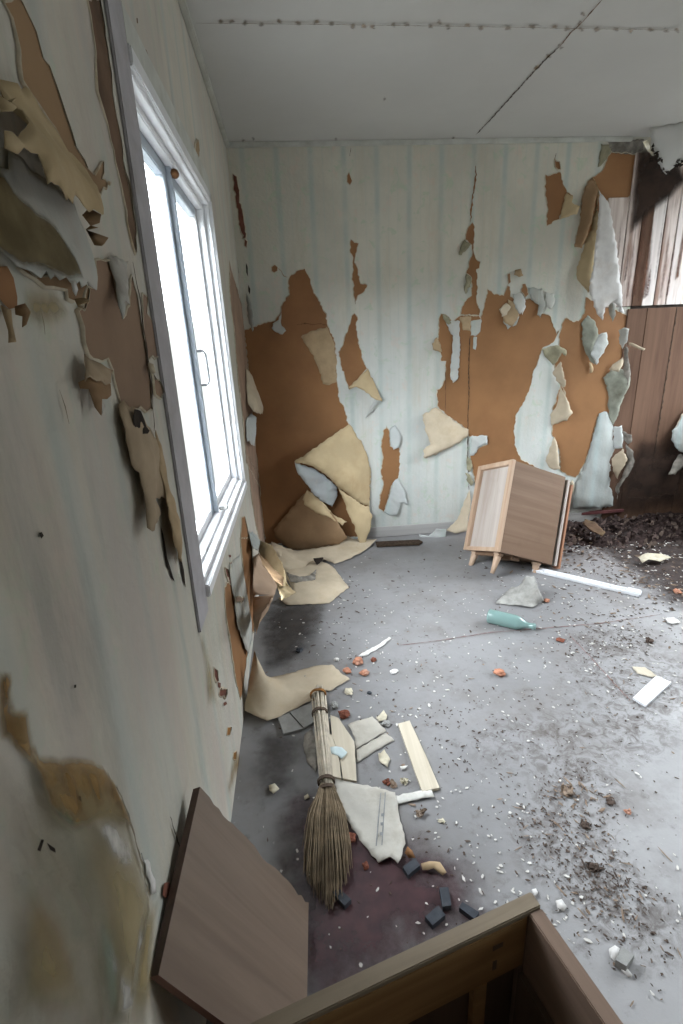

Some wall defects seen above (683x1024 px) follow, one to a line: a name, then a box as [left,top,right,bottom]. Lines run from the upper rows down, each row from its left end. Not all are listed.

crack [478,0,602,133]
peeling [465,457,473,486]